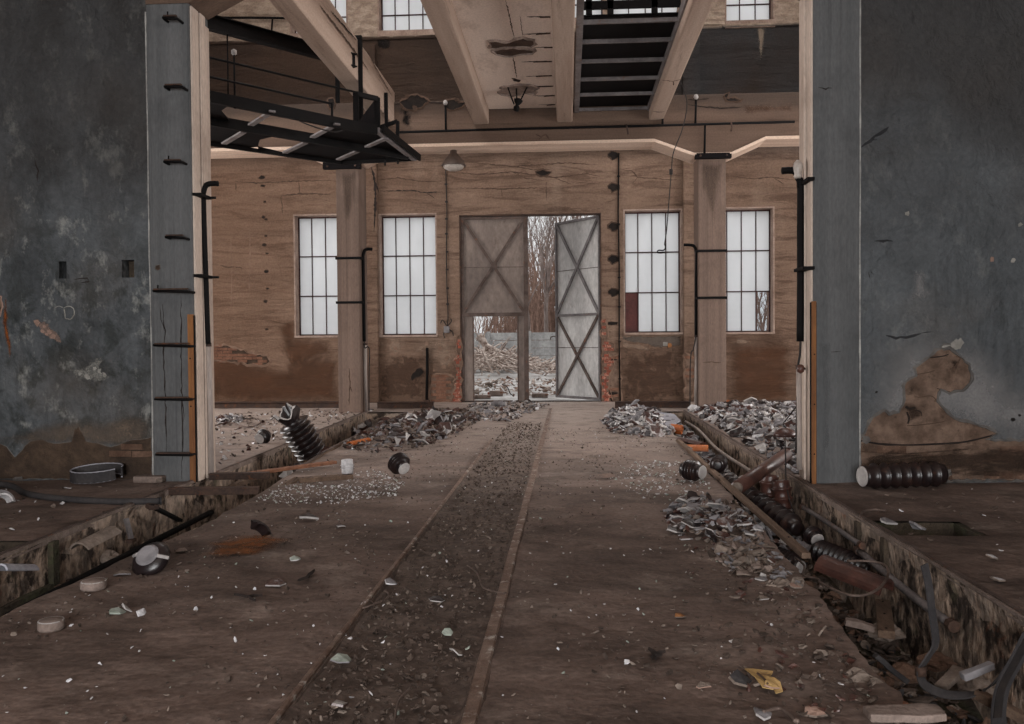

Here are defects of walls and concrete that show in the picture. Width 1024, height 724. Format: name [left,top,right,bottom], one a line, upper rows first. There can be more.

spalling [487,36,538,57]
spalling [446,97,466,112]
spalling [497,78,540,98]
crack [160,304,184,477]
flaking render [214,343,272,368]
flaking render [410,335,464,402]
flaking render [599,317,623,402]
flaking render [861,338,1024,483]